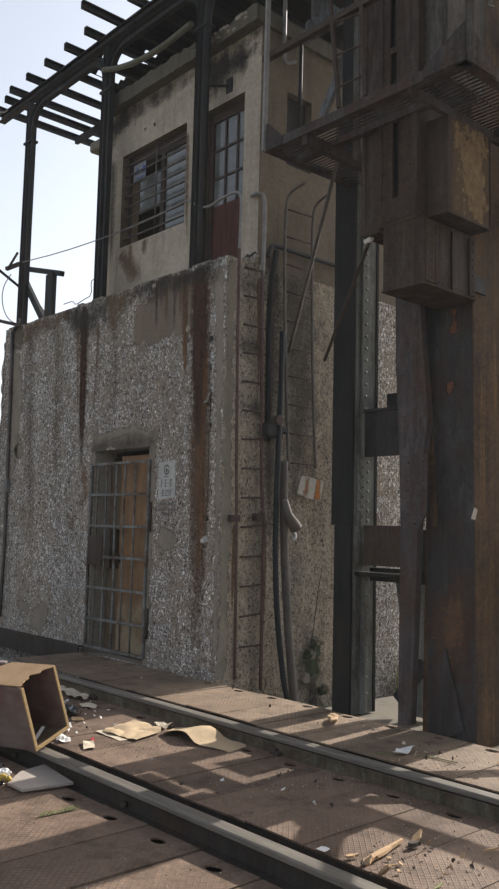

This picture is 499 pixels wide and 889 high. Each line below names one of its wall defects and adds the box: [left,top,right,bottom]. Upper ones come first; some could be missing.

leakage [105,163,171,330]
rust [77,307,99,453]
rust [182,267,210,625]